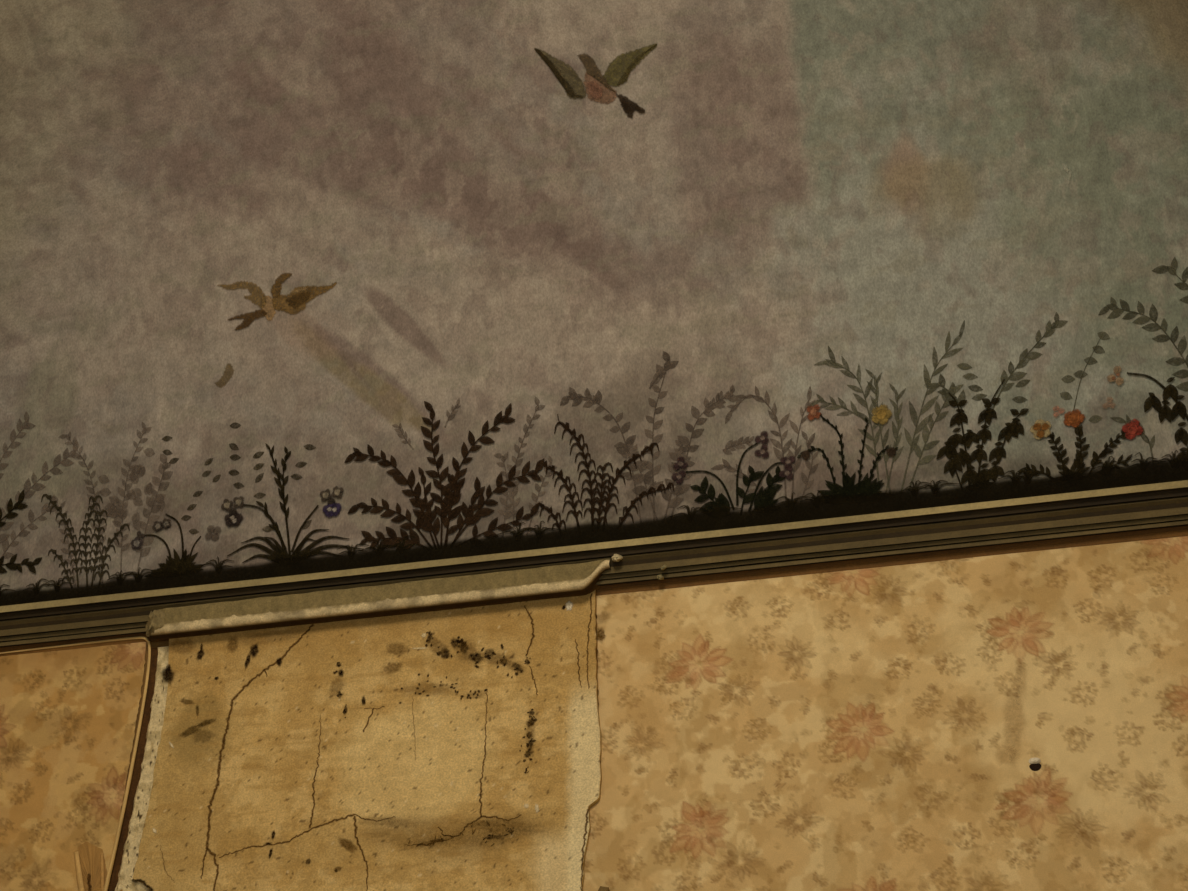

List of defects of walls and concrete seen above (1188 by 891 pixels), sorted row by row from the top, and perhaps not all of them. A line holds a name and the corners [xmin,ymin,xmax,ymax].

water stain [425,632,531,678]
crack [524,605,538,695]
crack [132,624,396,891]
flaking render [0,590,602,891]
crack [405,694,521,846]
water stain [520,709,537,773]